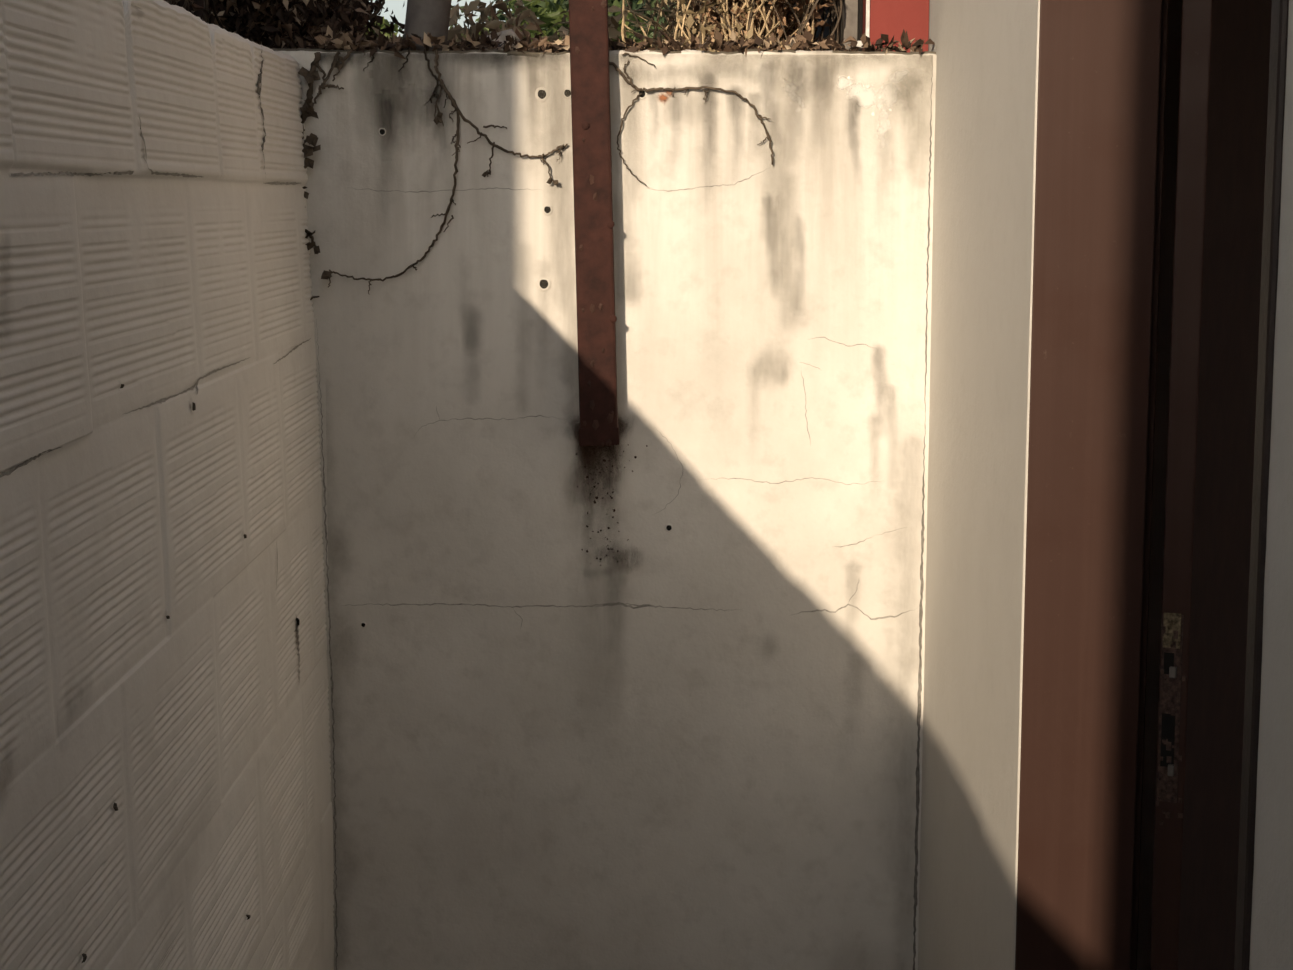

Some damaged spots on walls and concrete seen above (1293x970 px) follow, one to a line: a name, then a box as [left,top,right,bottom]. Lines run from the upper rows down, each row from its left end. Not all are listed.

crack [124,319,726,970]
corrosion [572,417,647,566]